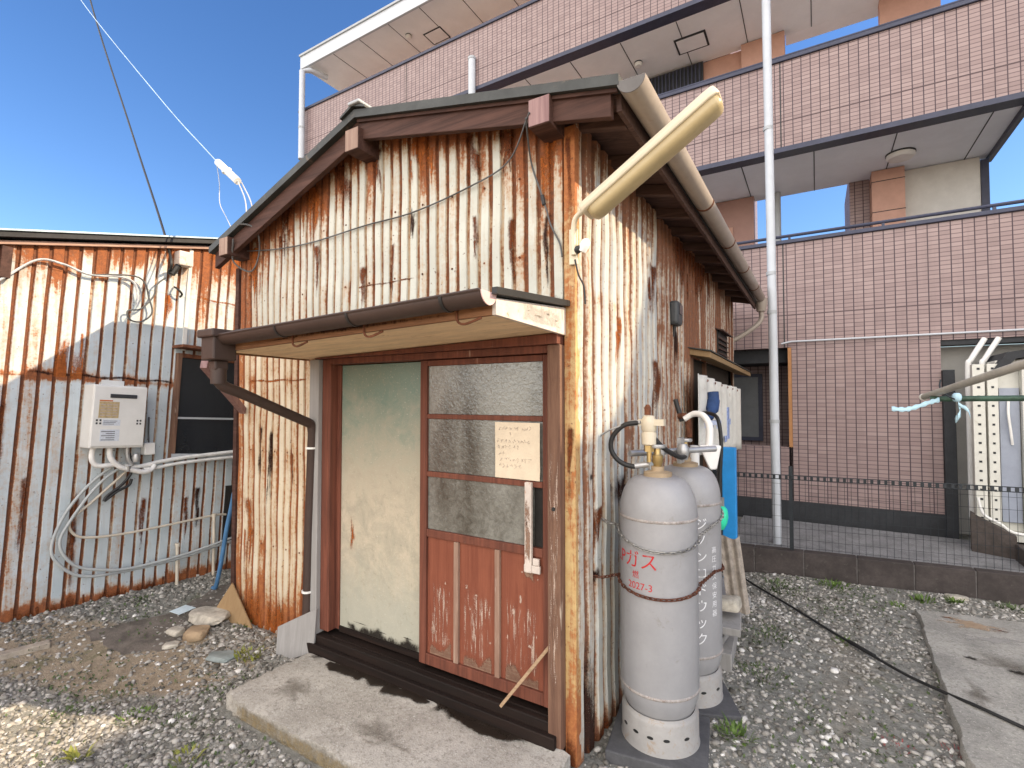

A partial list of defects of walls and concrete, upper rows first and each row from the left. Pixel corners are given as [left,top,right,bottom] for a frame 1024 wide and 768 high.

corrosion [336,165,352,213]
corrosion [508,219,516,280]
corrosion [164,295,172,318]
corrosion [647,265,657,310]
corrosion [53,334,85,379]
corrosion [652,361,661,415]
corrosion [258,427,273,501]
corrosion [68,496,79,580]
leakage [349,623,419,652]
peeling [430,582,492,674]
peeling [505,595,539,690]
corrosion [567,648,612,768]